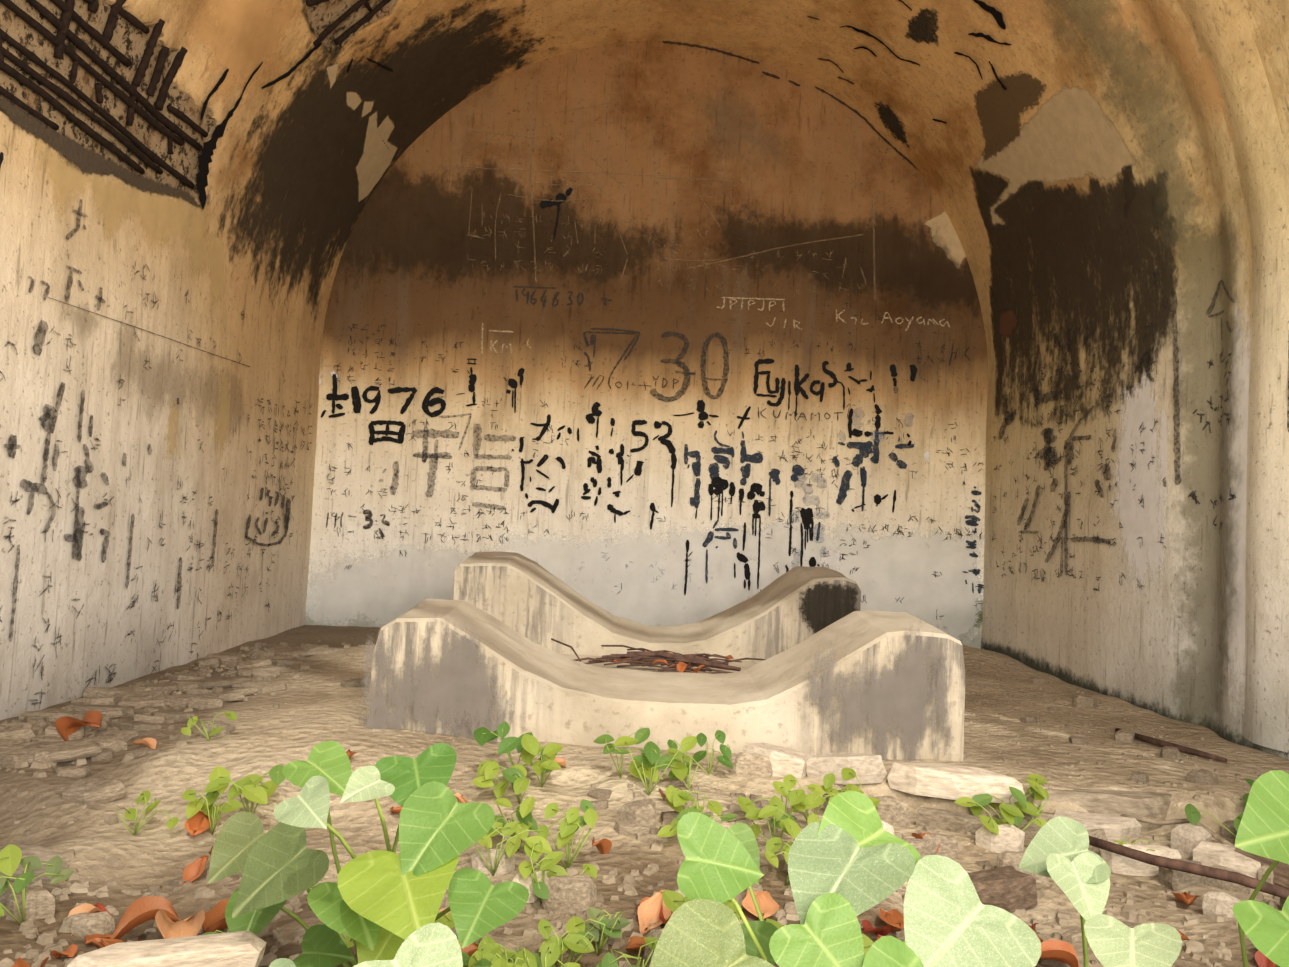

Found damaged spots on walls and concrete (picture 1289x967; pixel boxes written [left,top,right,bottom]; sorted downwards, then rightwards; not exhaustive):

spalling [0,0,216,208]
spalling [303,0,397,201]
peeling [974,71,1136,224]
water stain [1122,165,1135,218]
water stain [1152,171,1168,229]